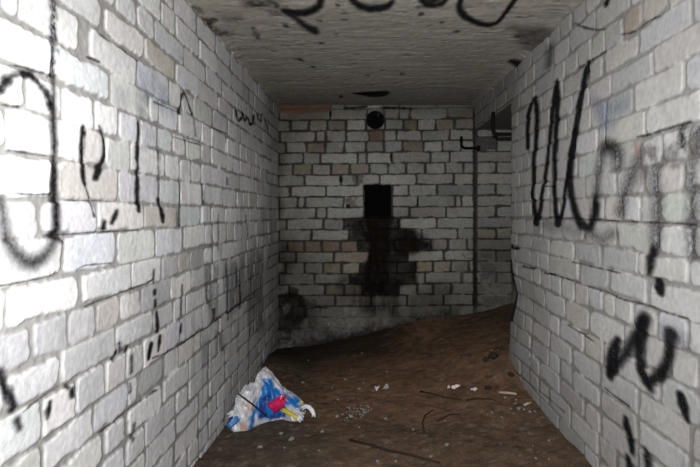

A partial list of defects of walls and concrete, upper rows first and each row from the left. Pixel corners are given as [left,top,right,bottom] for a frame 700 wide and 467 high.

damp [367,218,391,298]